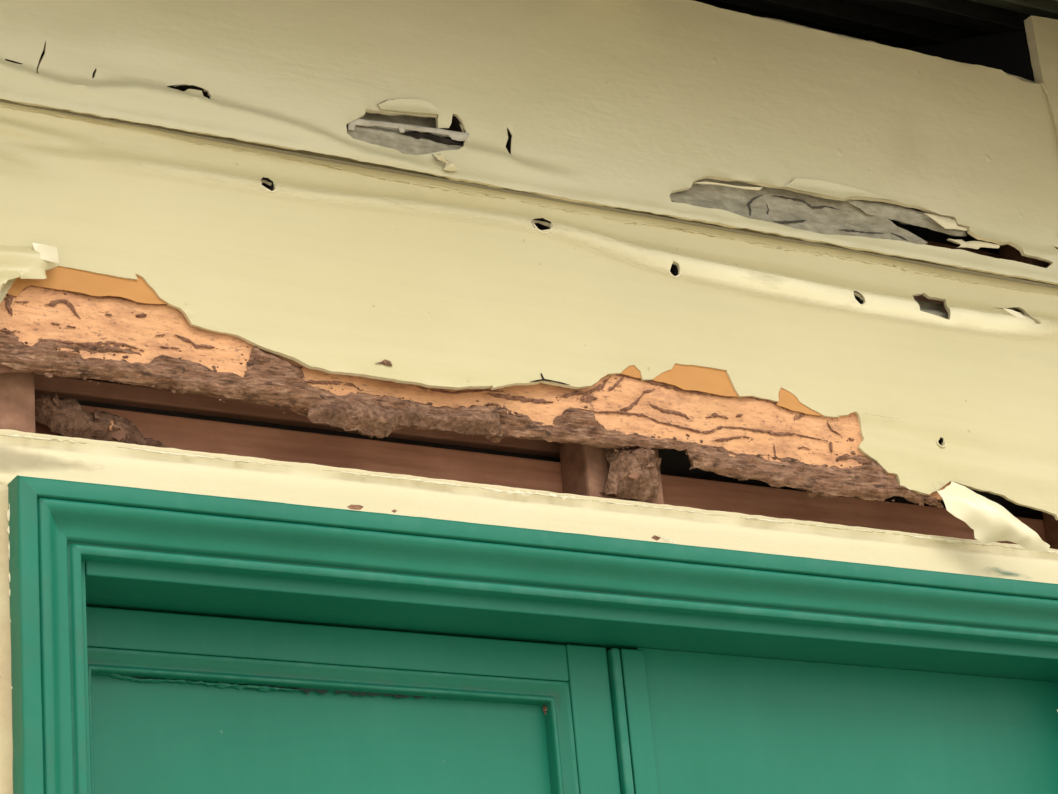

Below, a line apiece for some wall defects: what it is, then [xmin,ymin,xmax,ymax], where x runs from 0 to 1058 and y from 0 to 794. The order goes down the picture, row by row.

peeling [378,99,440,115]
peeling [694,182,763,191]
peeling [785,178,898,202]
peeling [924,213,967,231]
peeling [0,243,59,294]
peeling [109,420,126,442]
peeling [932,481,1050,552]